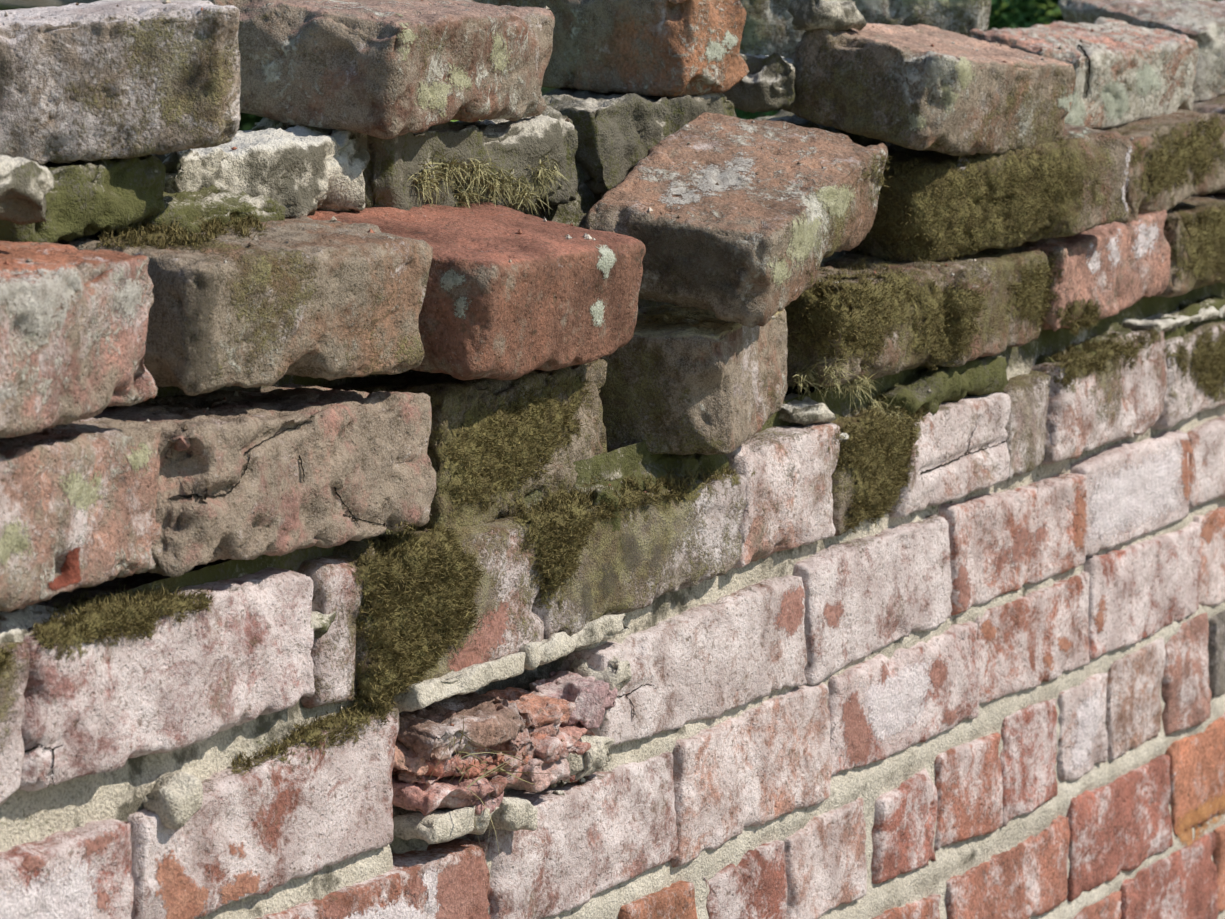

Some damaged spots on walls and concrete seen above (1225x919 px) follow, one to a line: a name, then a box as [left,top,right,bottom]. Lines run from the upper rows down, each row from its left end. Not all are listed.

crack [171,421,308,499]
crack [334,487,393,528]
spalling [392,656,632,844]